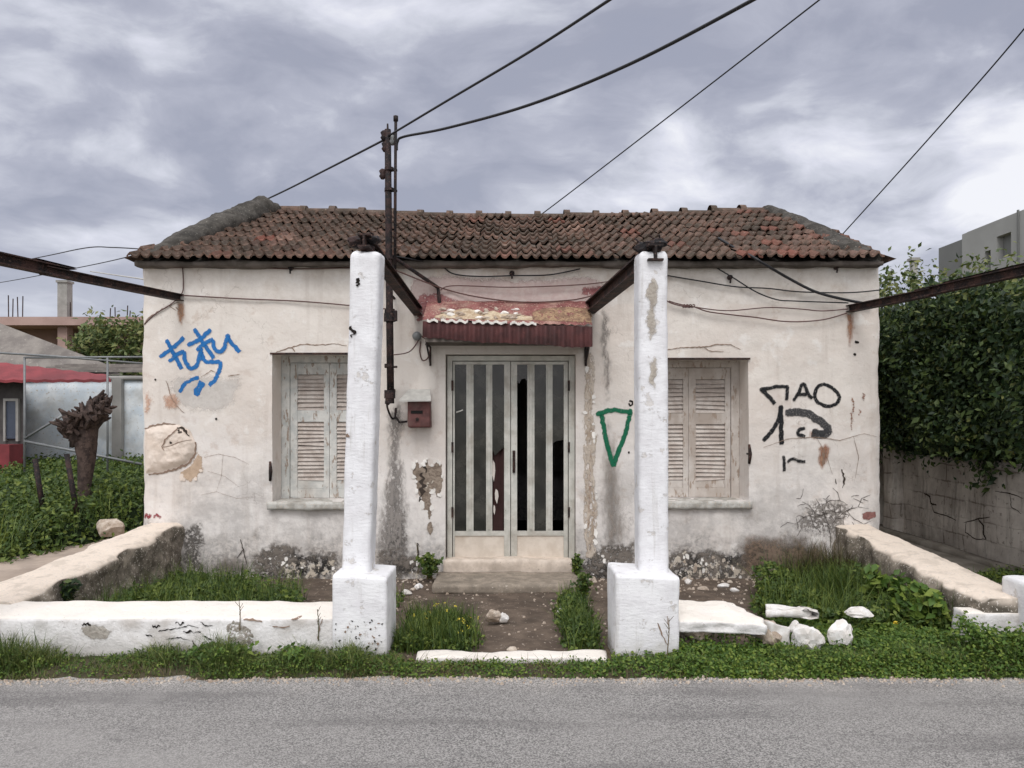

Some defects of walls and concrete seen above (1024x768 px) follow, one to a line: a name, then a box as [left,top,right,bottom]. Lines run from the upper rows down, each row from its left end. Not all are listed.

peeling [411,275,603,326]
peeling [645,279,658,339]
crack [277,343,347,352]
crack [668,344,739,352]
peeling [583,353,598,558]
corrosion [819,445,829,467]
water stain [379,410,434,579]
flaking render [411,458,443,535]
crack [924,491,1023,540]
water stain [183,525,205,571]
water stain [220,544,337,579]
flaking render [82,622,109,640]